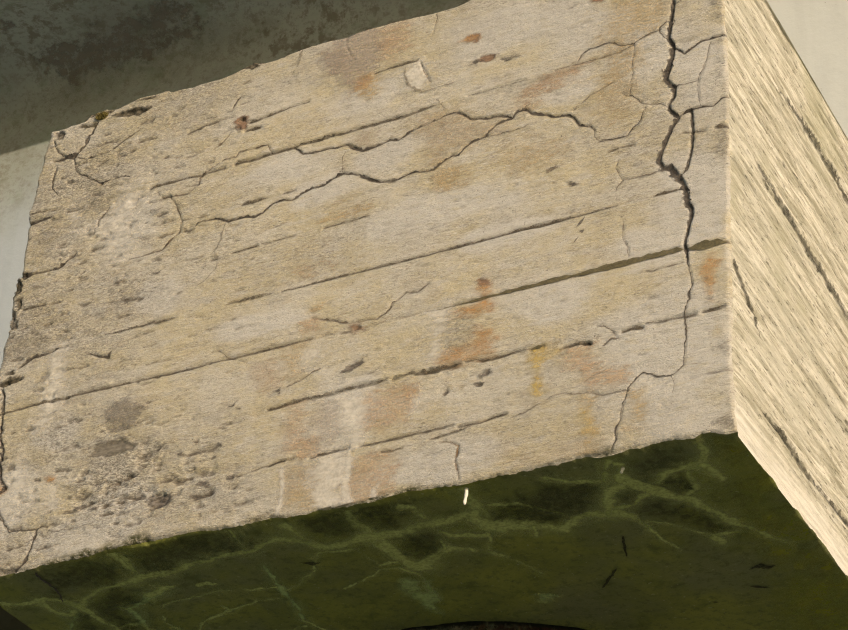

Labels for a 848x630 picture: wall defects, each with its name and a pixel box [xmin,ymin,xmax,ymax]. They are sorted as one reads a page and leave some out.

crack [23,254,76,310]
crack [31,124,138,226]
corrosion [234,115,248,130]
crack [131,0,760,450]
crack [758,163,846,316]
crack [778,89,848,201]
crack [22,318,173,367]
crack [0,339,309,494]
water stain [311,390,370,508]
crack [426,405,536,464]
crack [762,412,848,527]
crack [0,518,90,602]